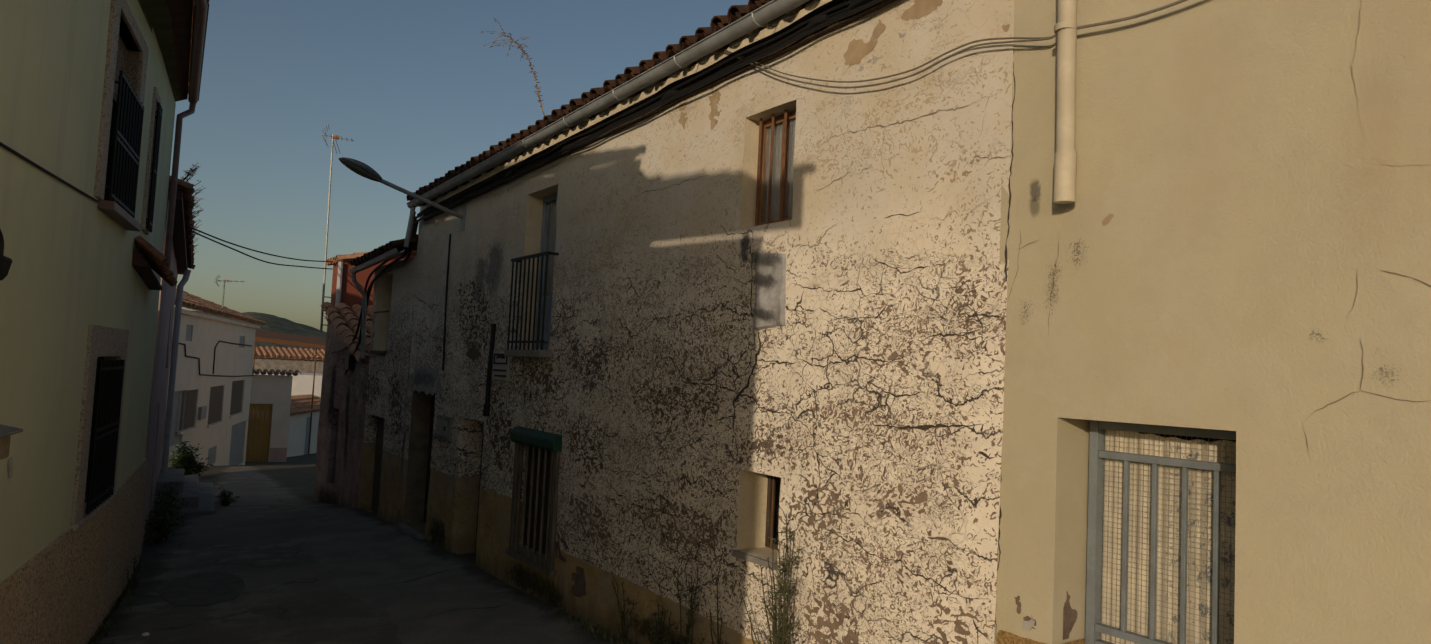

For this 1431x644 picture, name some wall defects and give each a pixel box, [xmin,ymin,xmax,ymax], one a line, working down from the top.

peeling [843,0,943,71]
crack [1351,2,1405,166]
crack [816,52,1059,334]
crack [590,465,710,537]
crack [672,226,1002,644]
crack [1302,270,1431,451]